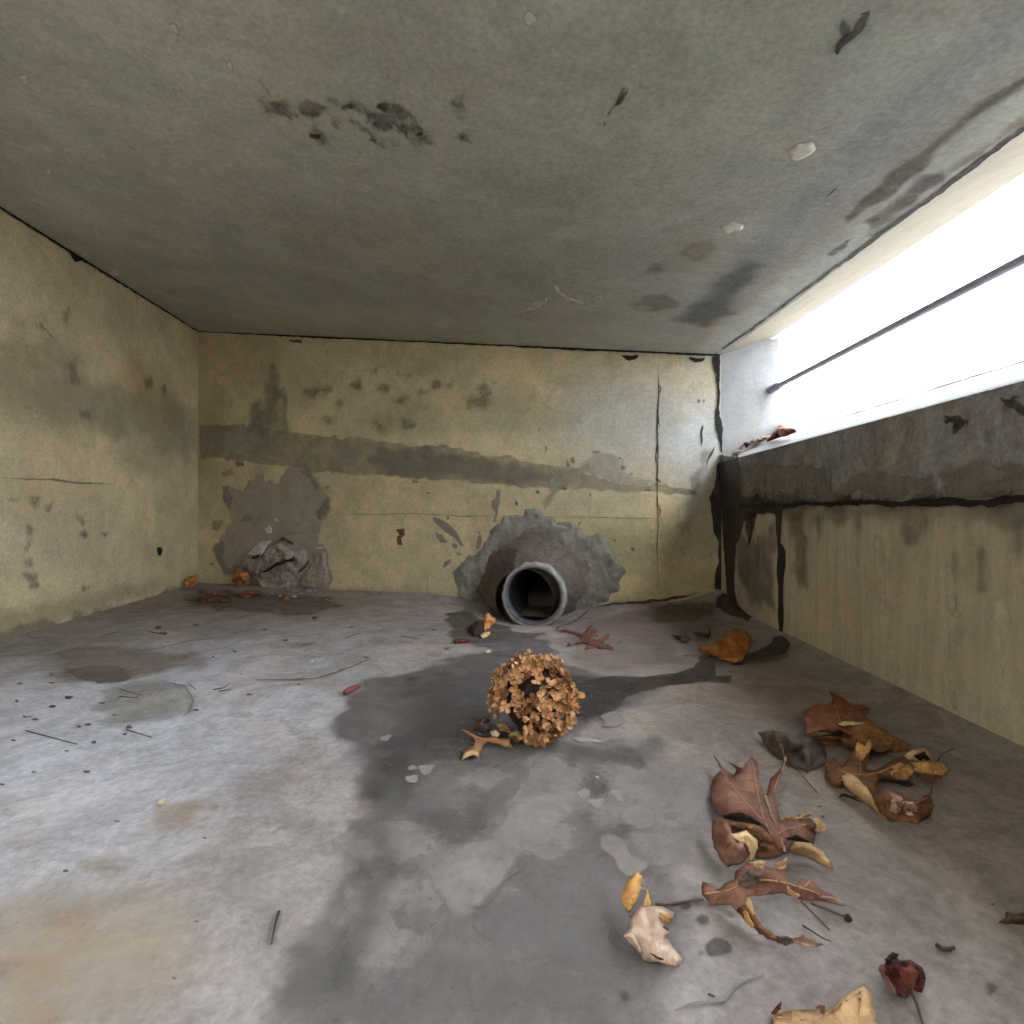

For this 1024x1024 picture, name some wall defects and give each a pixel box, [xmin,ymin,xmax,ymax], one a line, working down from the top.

leakage [847,78,1024,226]
leakage [686,266,759,326]
peeling [212,467,333,588]
leakage [200,365,620,490]
spalling [433,516,482,568]
crack [0,127,1024,632]
leakage [644,484,695,495]
leakage [709,455,842,613]
leakage [284,636,790,1024]